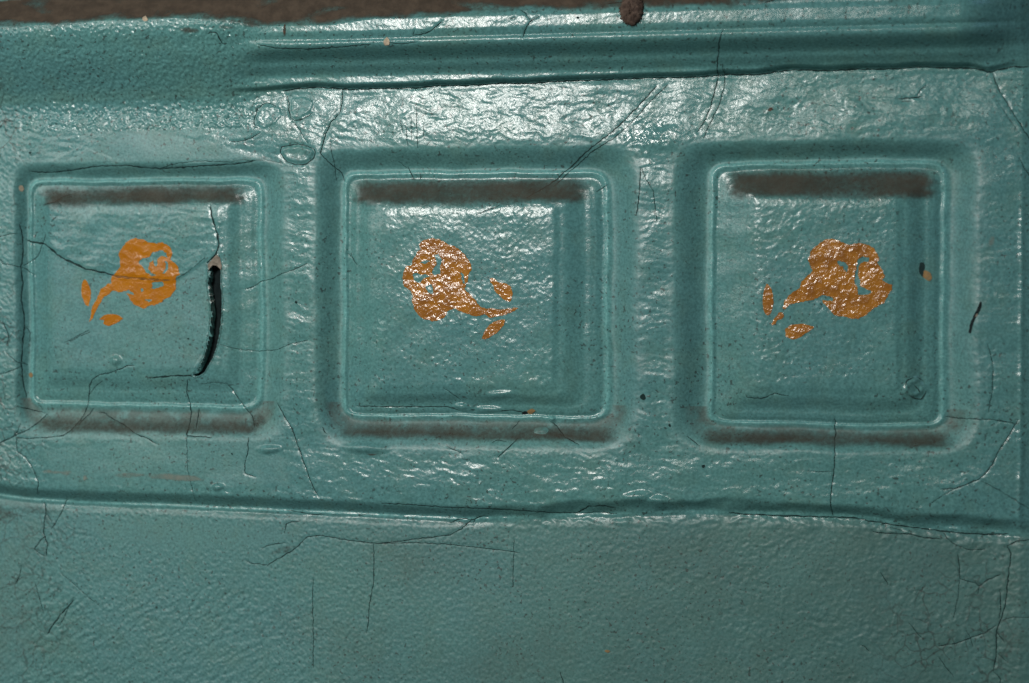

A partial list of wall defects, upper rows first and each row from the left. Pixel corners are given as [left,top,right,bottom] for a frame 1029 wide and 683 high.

crack [0,206,307,634]
crack [731,424,1029,681]
crack [934,350,1028,508]